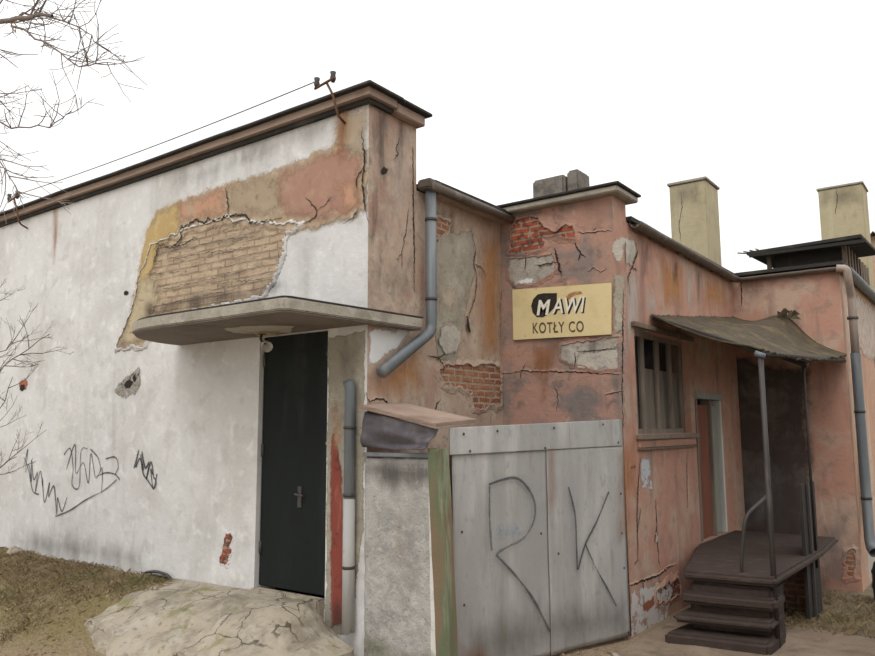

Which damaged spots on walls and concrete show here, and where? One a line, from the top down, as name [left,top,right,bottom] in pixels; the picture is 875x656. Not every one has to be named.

crack [343,129,369,224]
crack [152,188,282,264]
flaking render [114,105,369,354]
crack [394,138,416,292]
spalling [505,212,581,289]
crack [525,228,611,277]
crack [468,239,638,427]
flaking render [115,368,140,398]
spalling [434,357,503,415]
spalling [218,529,234,569]
peeling [631,571,682,637]